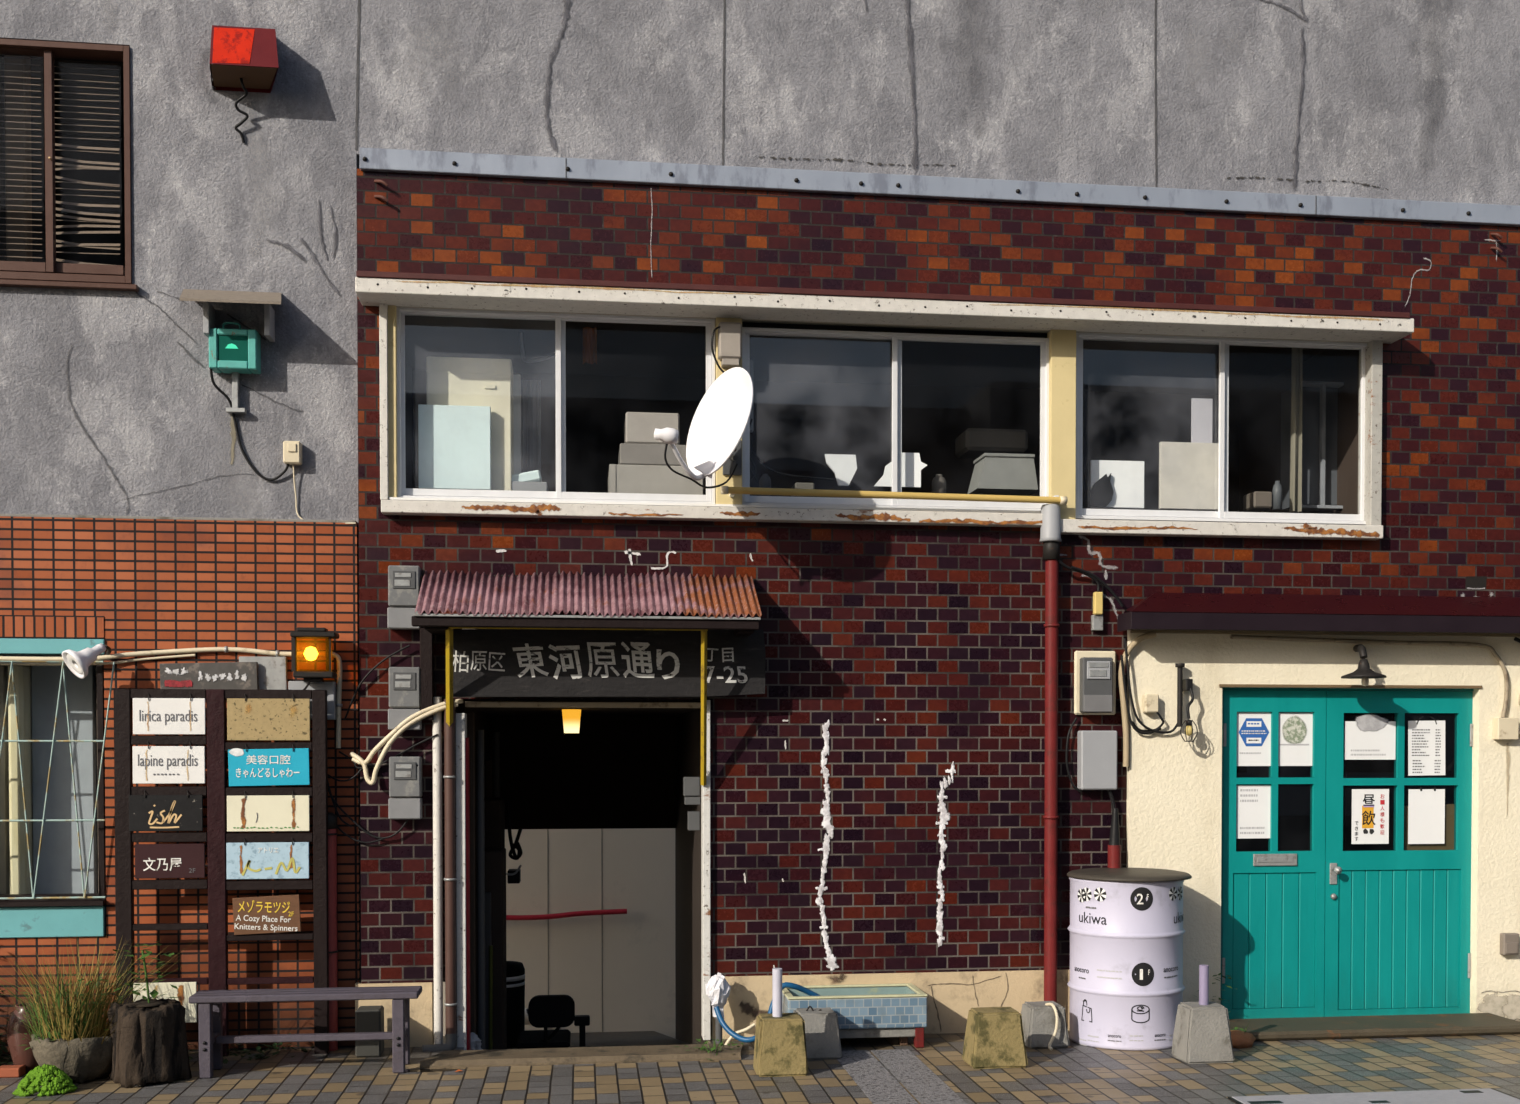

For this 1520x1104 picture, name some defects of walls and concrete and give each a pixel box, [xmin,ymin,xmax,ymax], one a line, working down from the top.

crack [543,0,571,151]
crack [905,0,918,170]
crack [1262,0,1308,189]
crack [267,200,340,296]
crack [66,344,253,513]
rust [462,503,560,516]
rust [835,513,1042,525]
rust [1284,523,1380,537]